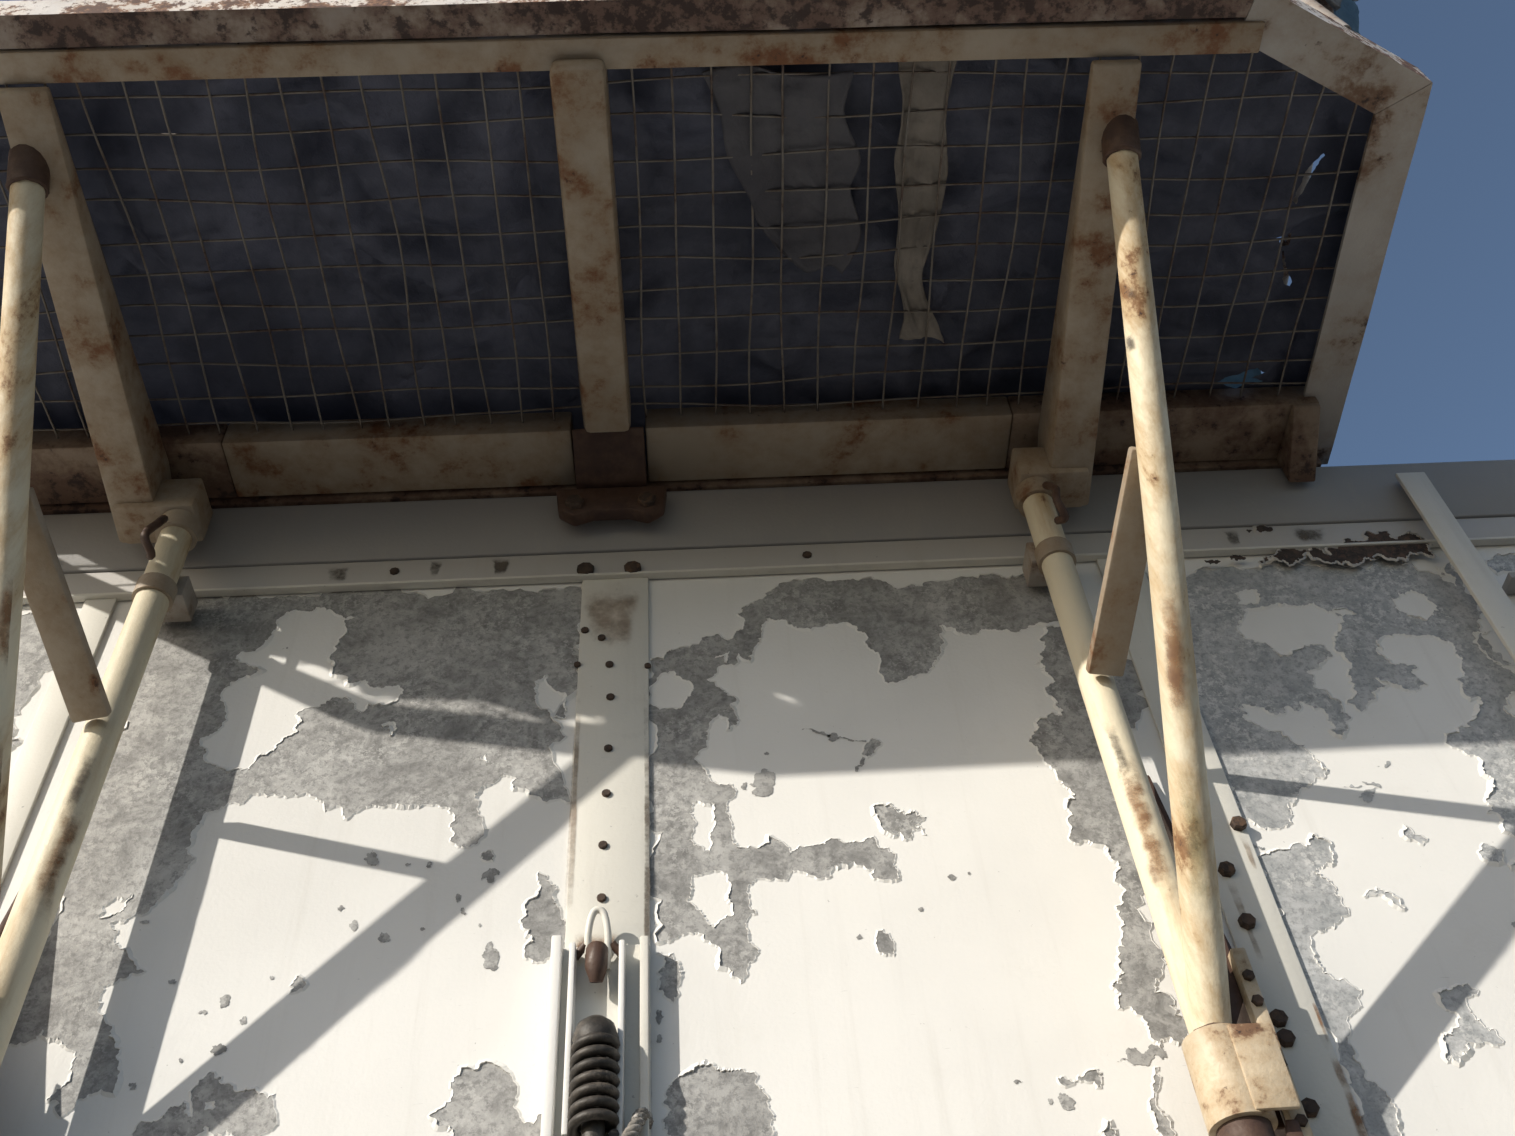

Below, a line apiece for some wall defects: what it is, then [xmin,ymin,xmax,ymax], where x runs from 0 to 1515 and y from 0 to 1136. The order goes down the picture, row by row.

corrosion [0,592,12,651]
corrosion [1165,607,1183,703]
peeling [8,585,582,1119]
peeling [649,573,1189,1136]
corrosion [1127,784,1163,876]
peeling [1186,525,1515,1136]
peeling [130,1043,280,1136]
peeling [427,1058,542,1136]